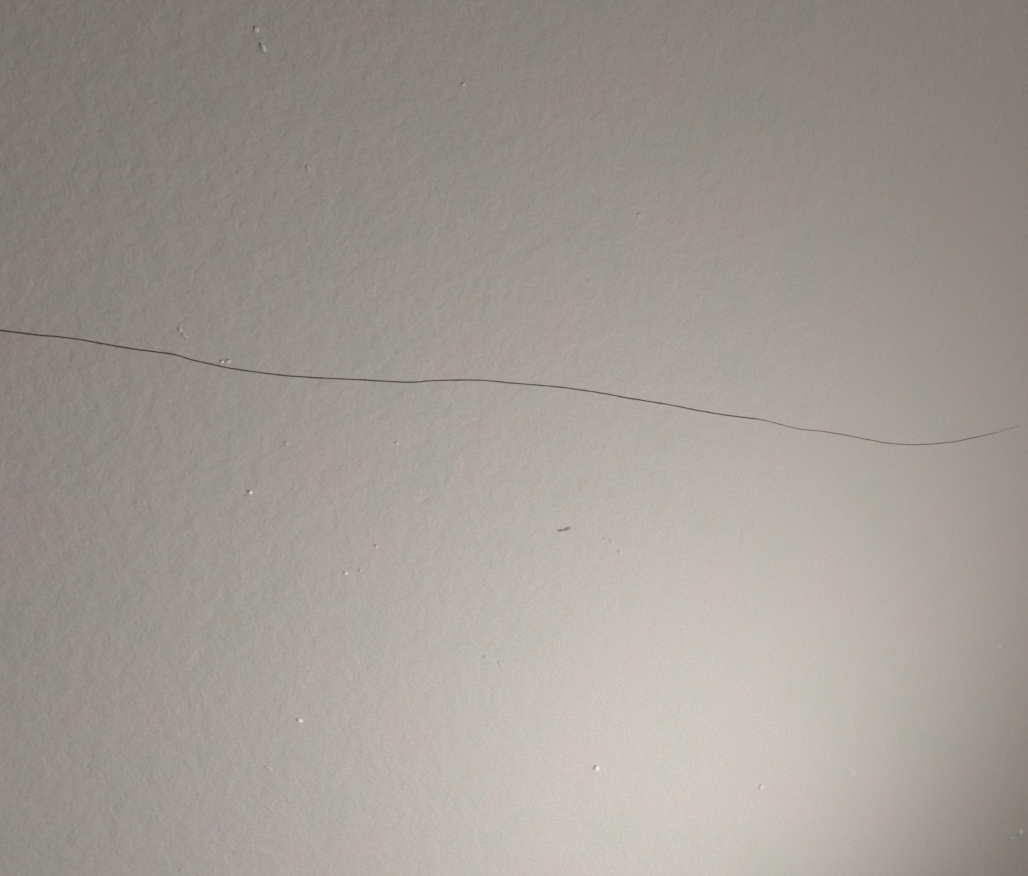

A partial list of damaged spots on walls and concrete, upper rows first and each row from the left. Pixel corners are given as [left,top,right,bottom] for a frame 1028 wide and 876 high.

crack [0,330,1020,445]